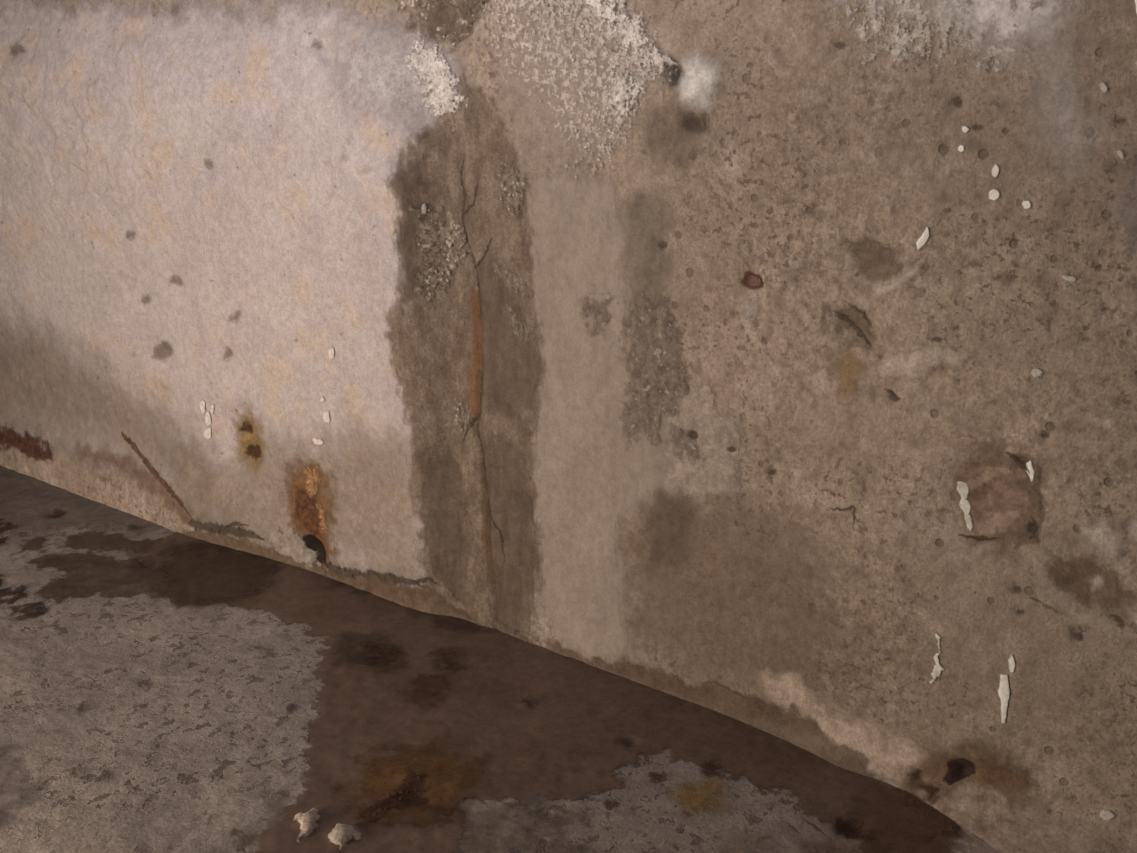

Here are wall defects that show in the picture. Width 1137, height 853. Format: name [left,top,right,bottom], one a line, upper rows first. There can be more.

leakage [484,0,676,169]
rust [237,412,263,467]
rust [287,461,336,568]
crack [454,160,505,609]
leakage [21,40,963,853]
spalling [947,436,1137,642]